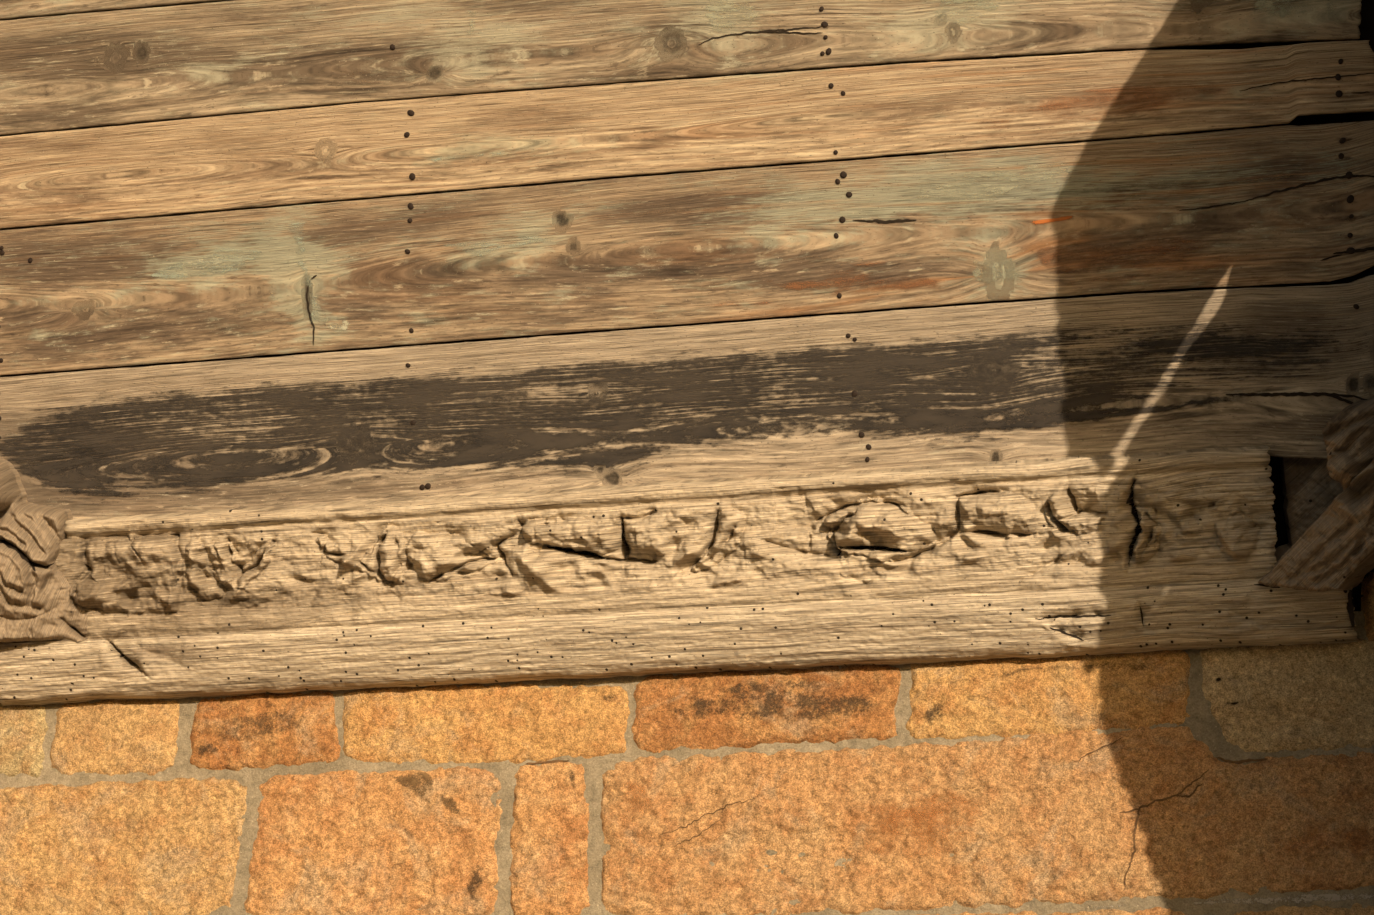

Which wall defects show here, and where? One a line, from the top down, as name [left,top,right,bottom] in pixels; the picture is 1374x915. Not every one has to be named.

crack [1179,175,1374,211]
crack [1320,247,1374,261]
crack [306,275,317,345]
water stain [0,313,1371,497]
crack [1126,482,1142,564]
crack [526,758,569,766]
crack [1078,737,1122,761]
crack [1120,757,1267,890]